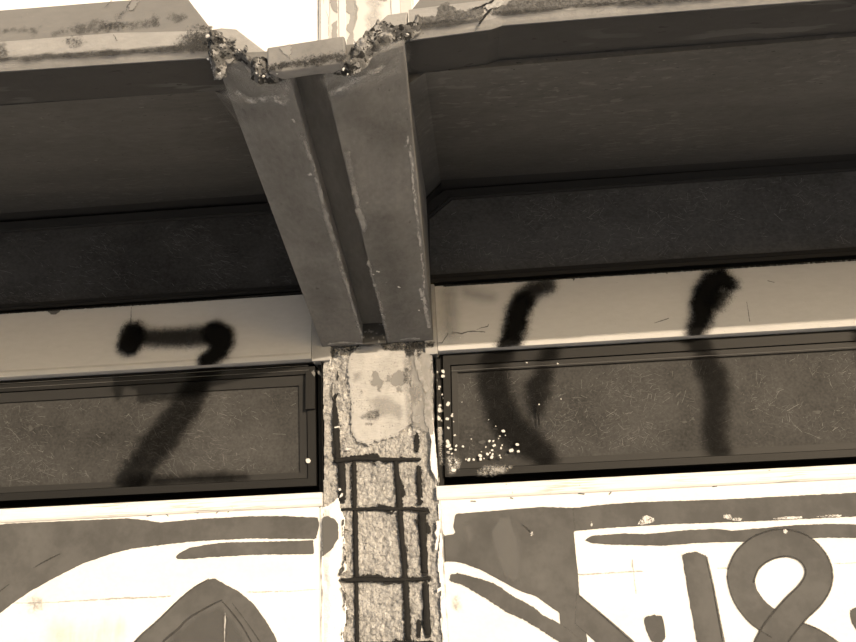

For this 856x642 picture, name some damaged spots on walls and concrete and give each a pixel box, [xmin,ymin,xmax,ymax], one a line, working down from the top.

spalling [206,29,284,86]
spalling [330,0,423,76]
crack [473,0,504,24]
water stain [381,341,434,356]
spalling [304,136,447,642]
water stain [371,368,408,392]